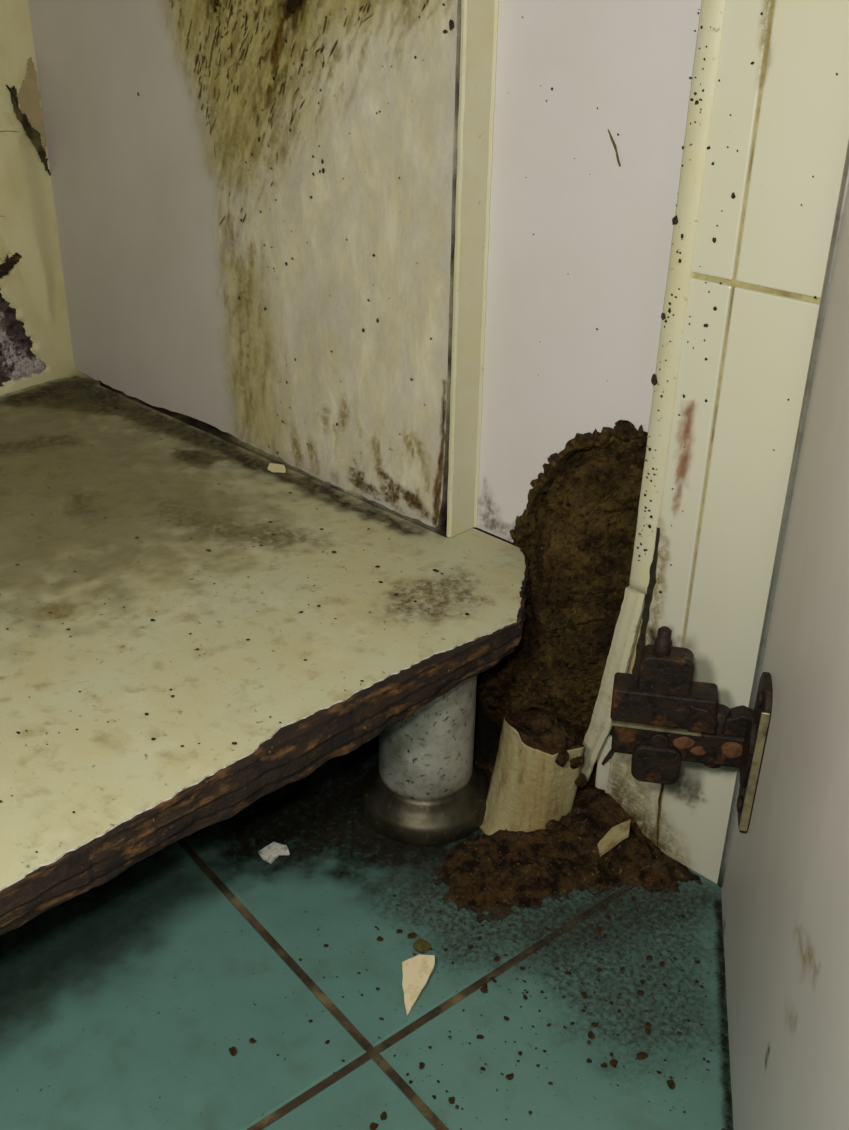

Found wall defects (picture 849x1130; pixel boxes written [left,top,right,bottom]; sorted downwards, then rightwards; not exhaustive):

flaking render [0,253,46,387]
leakage [169,0,454,517]
corrosion [675,411,690,507]